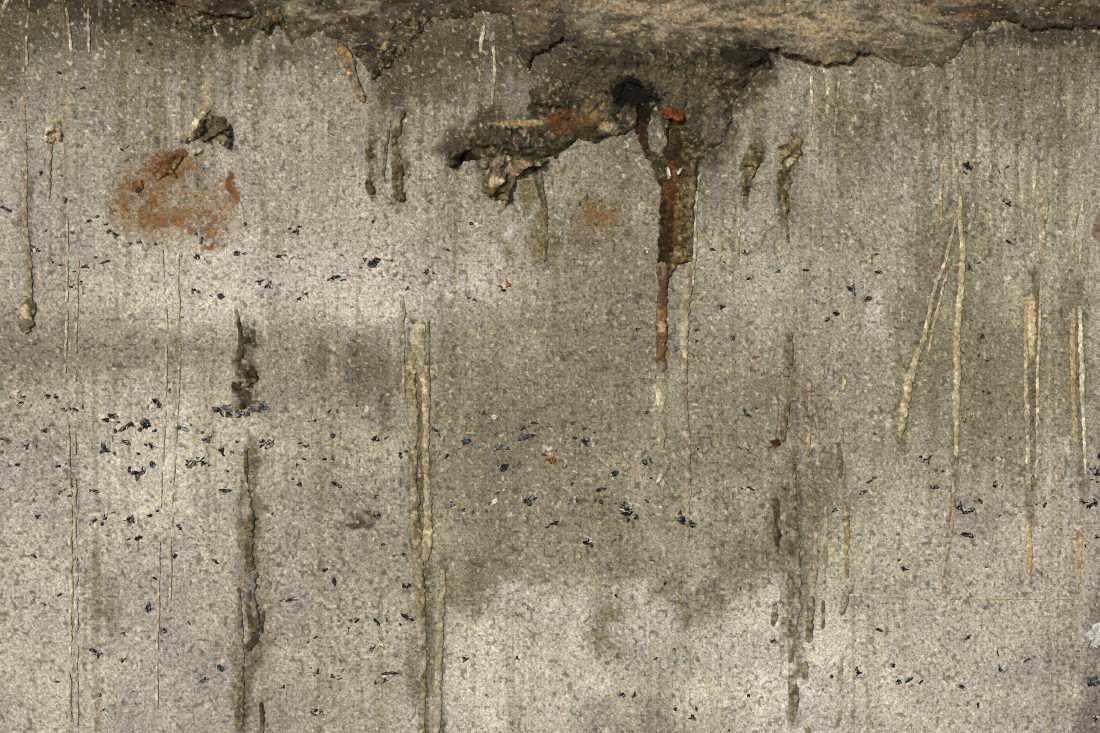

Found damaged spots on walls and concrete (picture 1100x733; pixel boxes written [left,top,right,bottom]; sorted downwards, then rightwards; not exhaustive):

peeling [352,44,403,80]
corrosion [109,106,239,251]
water stain [229,308,262,416]
corrosion [644,125,703,543]
water stain [771,331,808,449]
water stain [895,196,1040,522]
water stain [231,439,265,733]
water stain [337,511,379,530]
water stain [397,318,447,733]
water stain [497,442,843,733]
water stain [839,505,850,615]
spalling [955,499,983,515]